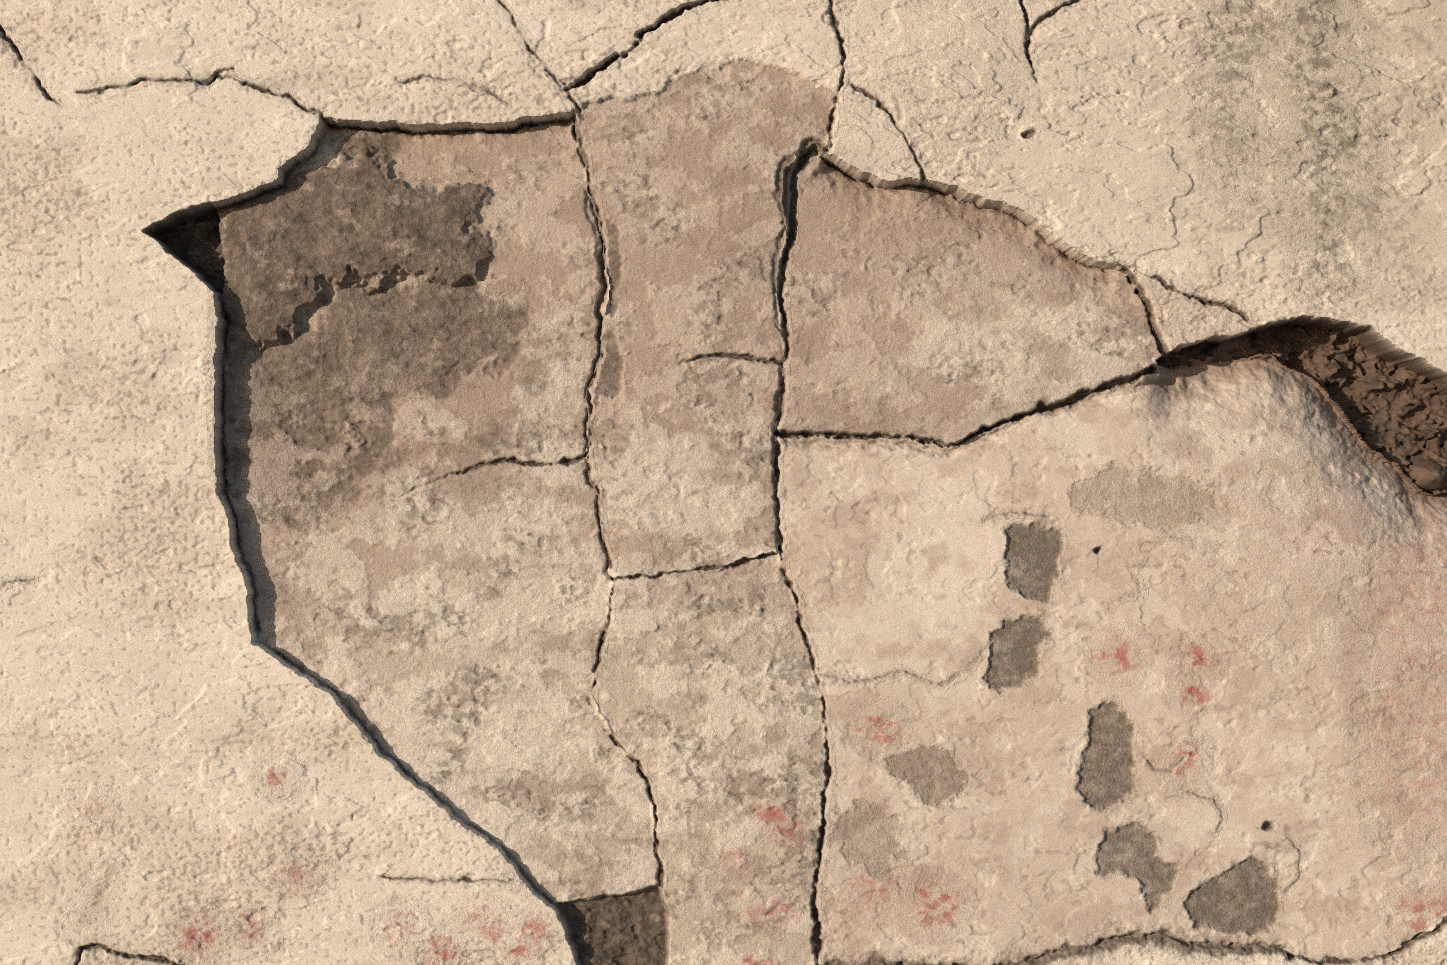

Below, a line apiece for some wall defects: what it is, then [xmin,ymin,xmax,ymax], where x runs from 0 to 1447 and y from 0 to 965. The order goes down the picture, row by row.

crack [0,16,337,132]
leakage [329,112,418,177]
peeling [1152,284,1249,349]
spalling [165,53,1156,881]
crack [378,0,1447,965]
peeling [1067,460,1220,615]
leakage [840,694,913,765]
leakage [1077,621,1230,793]
peeling [1073,694,1304,937]
crack [70,938,230,965]
spalling [668,934,727,965]